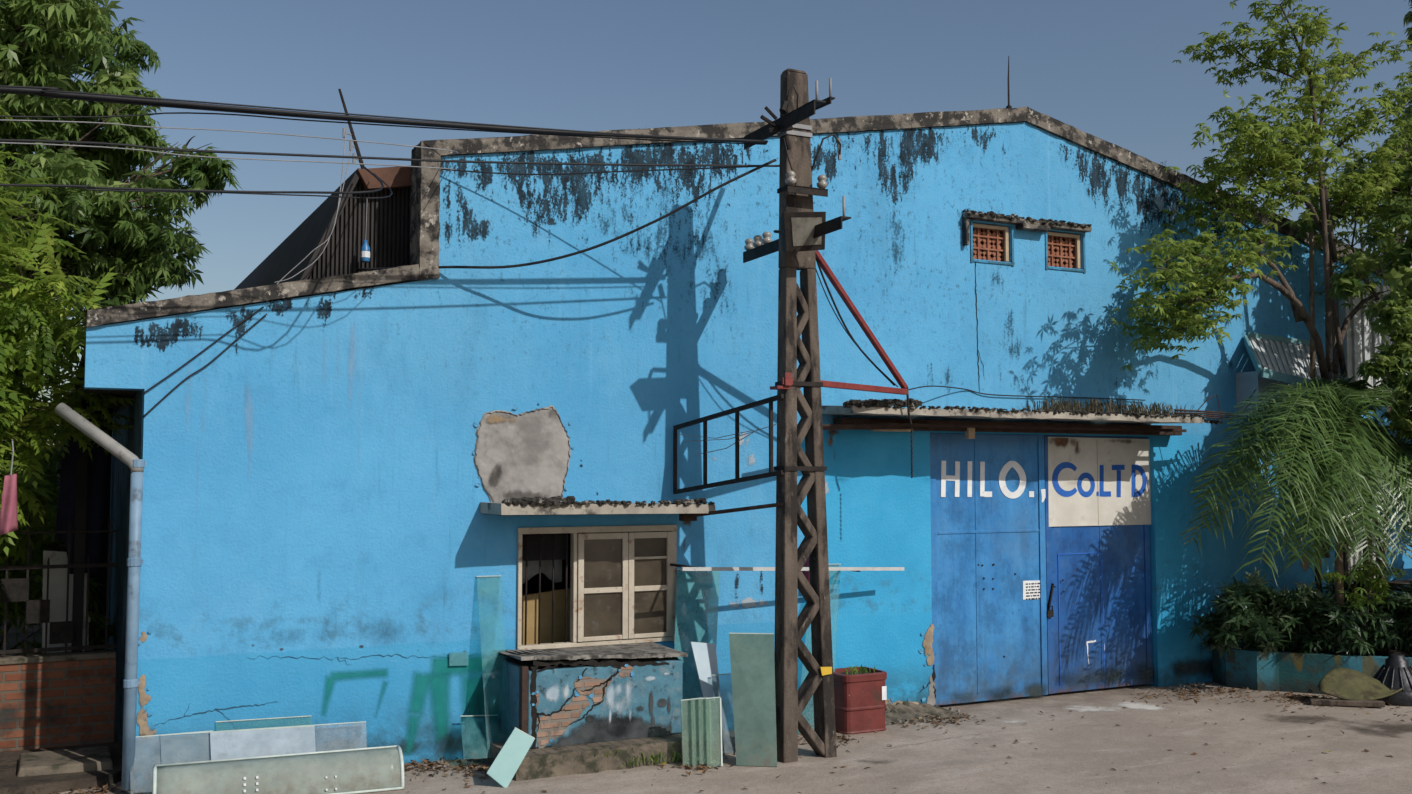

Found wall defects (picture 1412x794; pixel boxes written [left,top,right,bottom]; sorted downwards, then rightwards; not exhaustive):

damp [440,138,768,333]
damp [811,124,1006,273]
damp [134,317,203,352]
damp [226,287,374,353]
flaking render [472,403,583,502]
peeling [137,675,157,742]
flaking render [531,664,635,749]